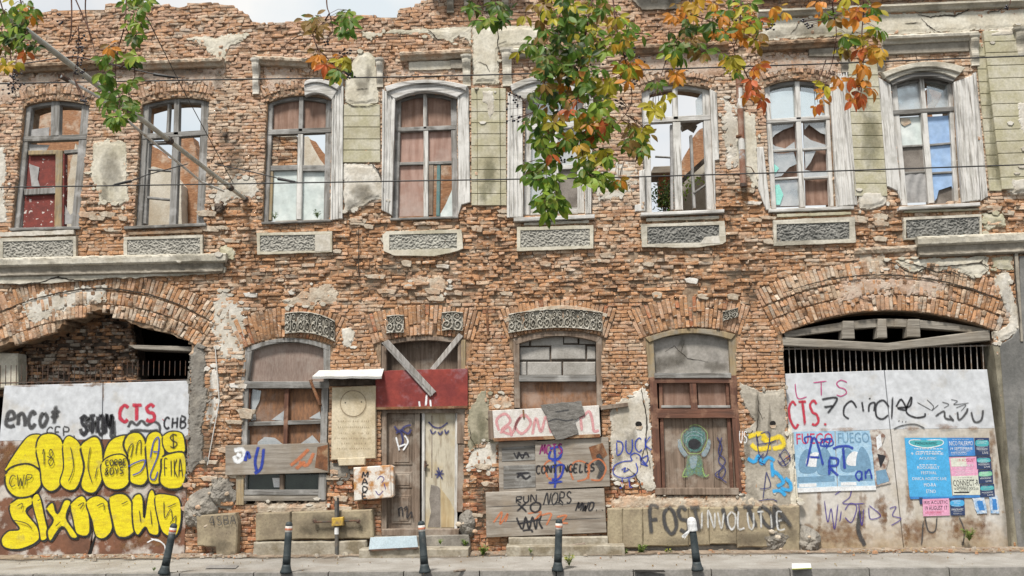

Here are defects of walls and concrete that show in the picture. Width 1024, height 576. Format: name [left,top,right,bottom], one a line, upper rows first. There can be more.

flaking render [0,32,250,105]
flaking render [78,138,137,235]
spalling [180,96,805,513]
spalling [835,188,1019,346]
spalling [440,390,513,538]